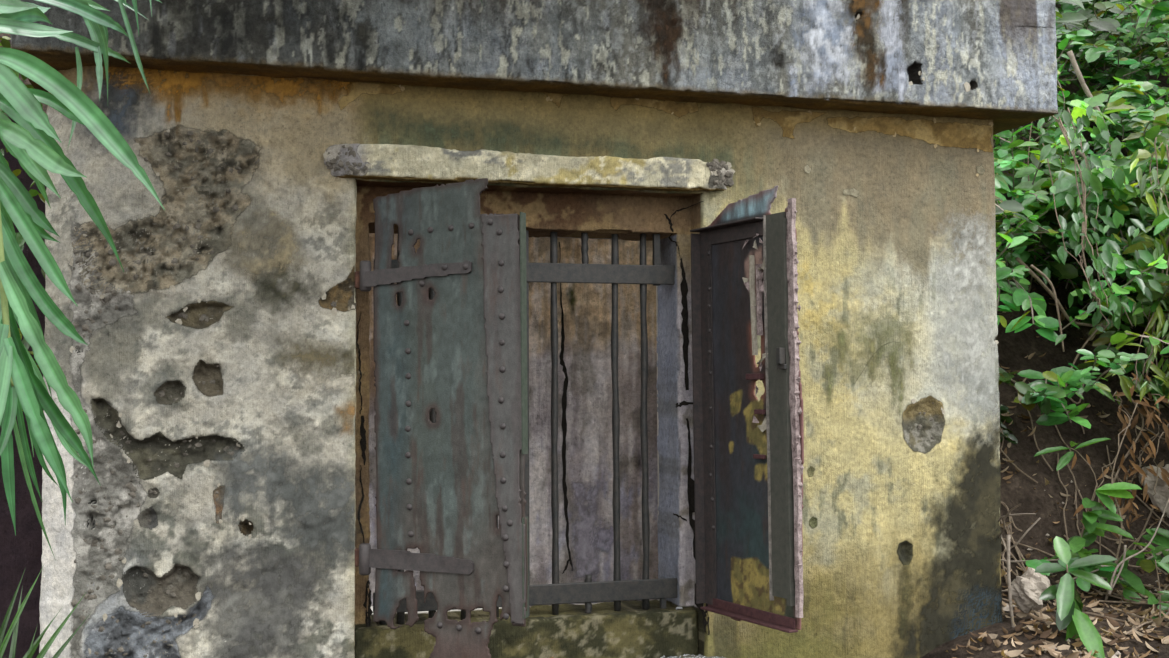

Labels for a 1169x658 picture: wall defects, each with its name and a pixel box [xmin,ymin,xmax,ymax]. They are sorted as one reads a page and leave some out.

corrosion [104,67,351,121]
water stain [640,0,683,82]
water stain [773,0,853,97]
corrosion [847,0,886,85]
spalling [907,62,925,85]
spalling [319,267,356,316]
spalling [68,125,262,658]
crack [664,201,710,635]
water stain [826,324,912,401]
spalling [902,396,945,454]
water stain [894,221,1003,658]
spalling [897,541,913,565]